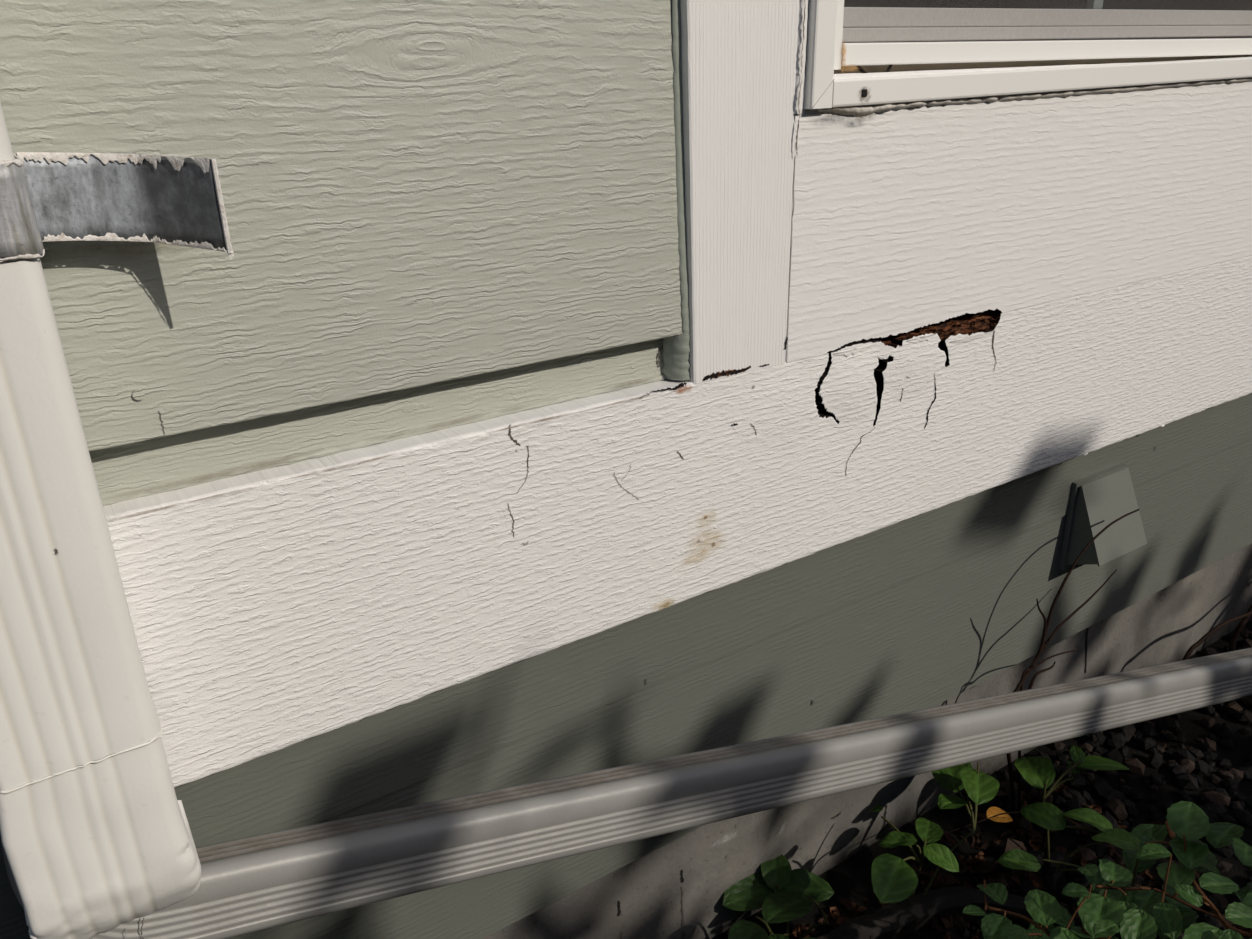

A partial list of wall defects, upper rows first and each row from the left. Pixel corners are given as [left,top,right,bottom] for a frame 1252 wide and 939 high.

crack [815,331,940,469]